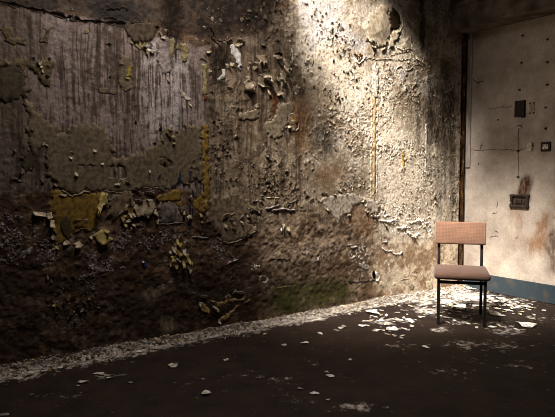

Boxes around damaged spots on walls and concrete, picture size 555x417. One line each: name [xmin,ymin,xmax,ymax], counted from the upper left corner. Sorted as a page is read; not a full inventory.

crack [0,0,160,30]
peeling [124,21,189,82]
peeling [188,0,460,244]
peeling [0,56,204,256]
corrosion [518,176,531,198]
corrosion [531,216,555,268]